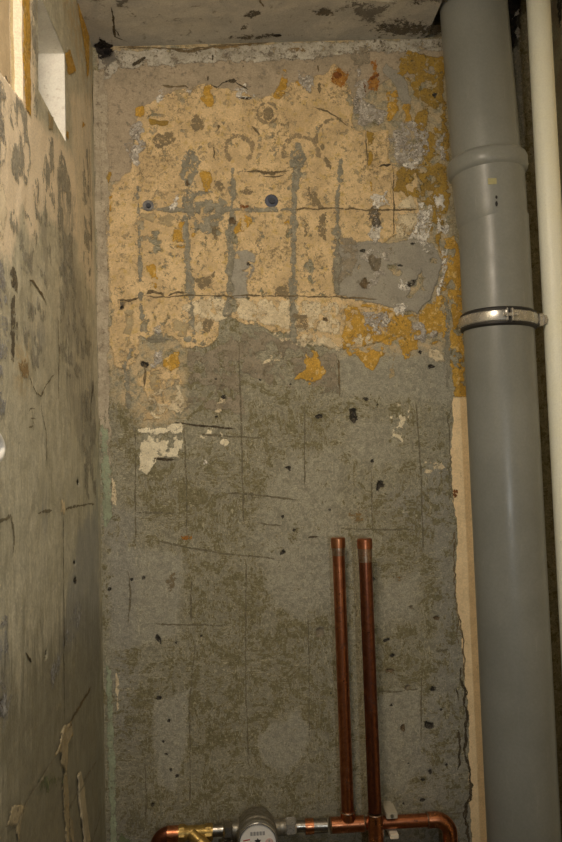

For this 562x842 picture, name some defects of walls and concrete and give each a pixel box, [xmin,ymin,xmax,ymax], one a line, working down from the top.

rust [331,67,349,88]
rust [363,58,380,92]
flaking render [106,50,466,475]
crack [124,290,376,302]
flaking render [54,723,90,842]